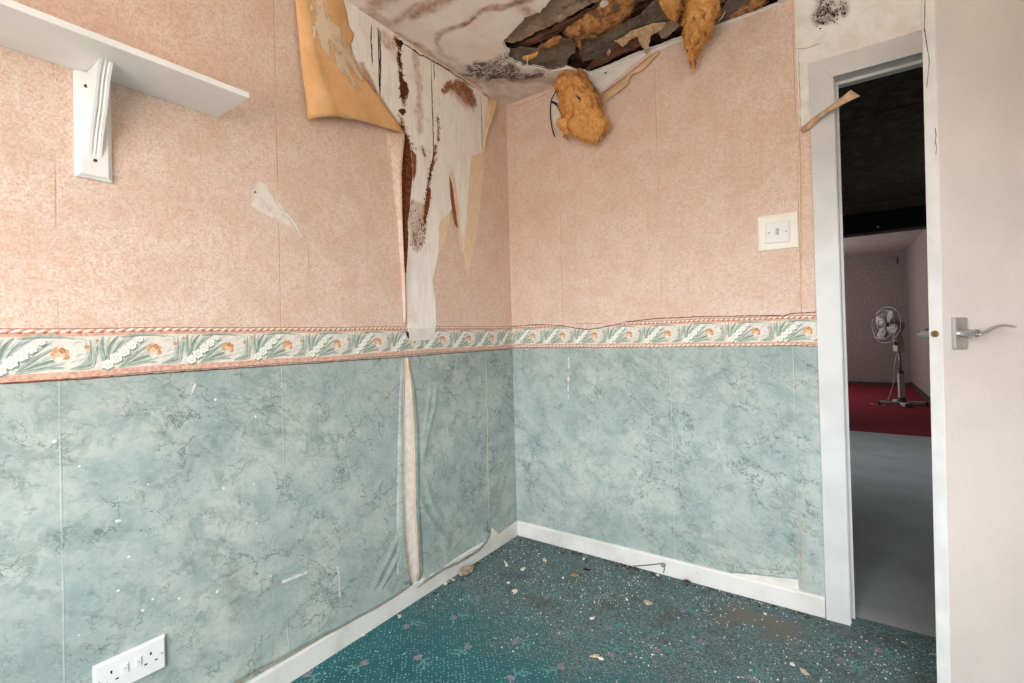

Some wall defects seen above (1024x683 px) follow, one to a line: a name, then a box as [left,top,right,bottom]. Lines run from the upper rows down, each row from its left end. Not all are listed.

damp [812,0,847,29]
damp [441,53,549,103]
flaking render [551,89,560,125]
flaking render [588,36,682,104]
peeling [295,0,498,341]
flaking render [794,0,922,307]